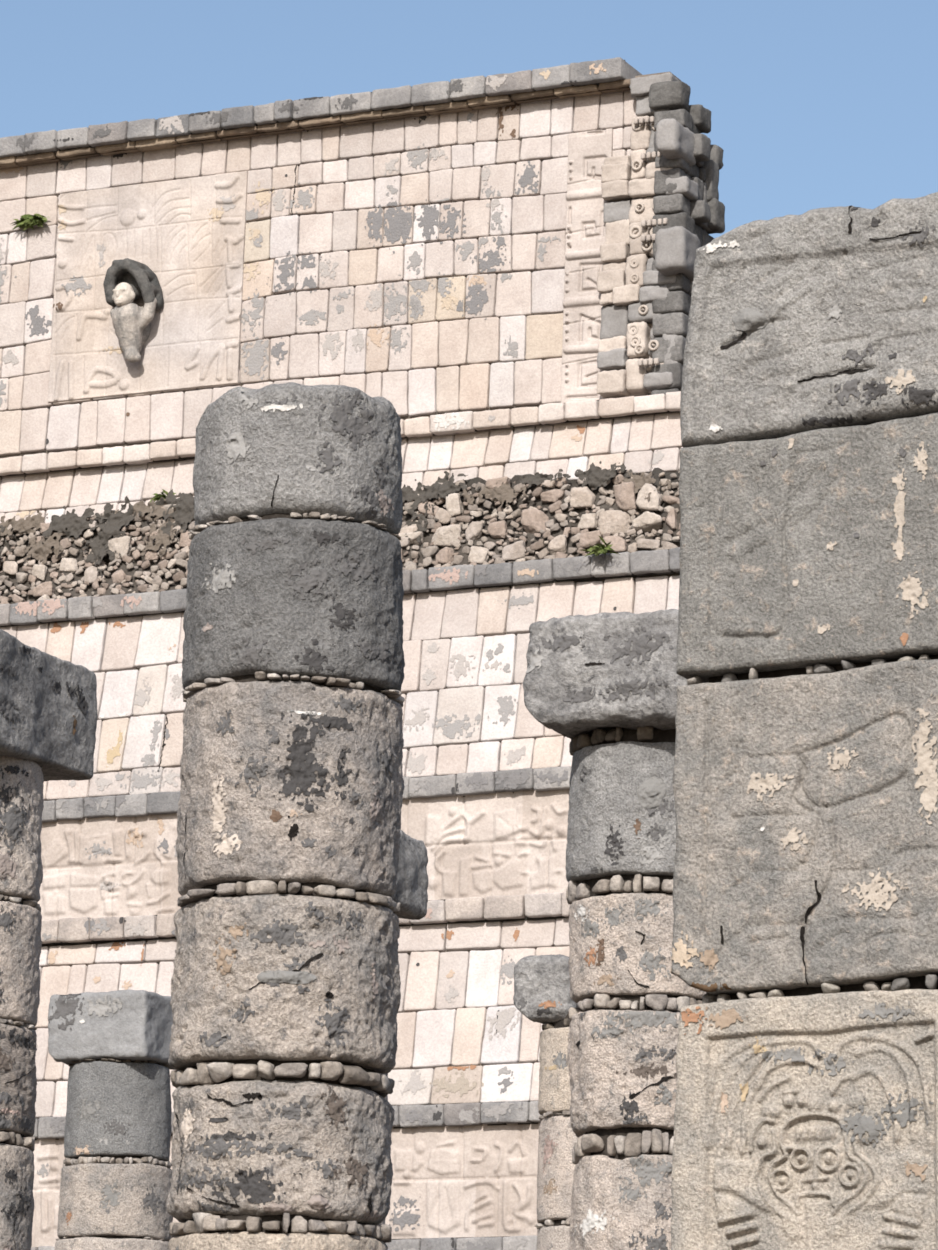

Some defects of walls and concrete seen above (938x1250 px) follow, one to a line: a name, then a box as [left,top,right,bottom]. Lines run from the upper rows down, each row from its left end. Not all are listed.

crack [800,880,821,985]